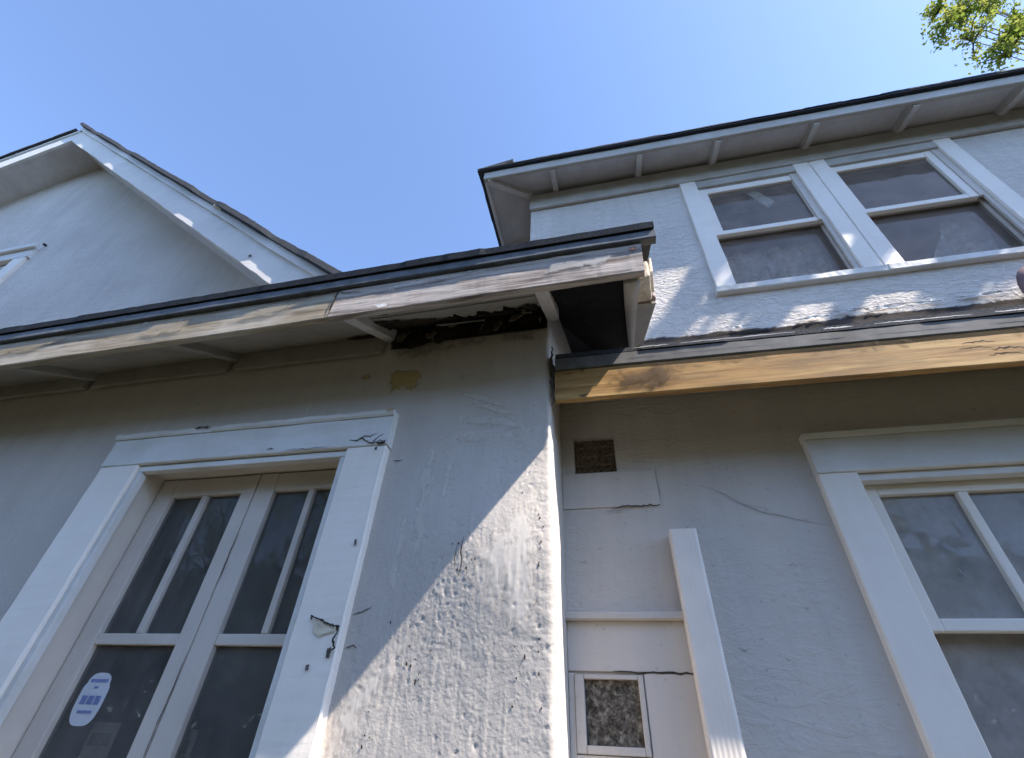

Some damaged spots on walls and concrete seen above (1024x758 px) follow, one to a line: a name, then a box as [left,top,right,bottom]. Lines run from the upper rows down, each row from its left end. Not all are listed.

peeling [548,256,610,272]
hole [396,305,543,331]
crack [352,433,403,461]
crack [610,468,661,511]
spalling [310,614,340,658]
peeling [318,615,422,758]
crack [614,669,693,677]